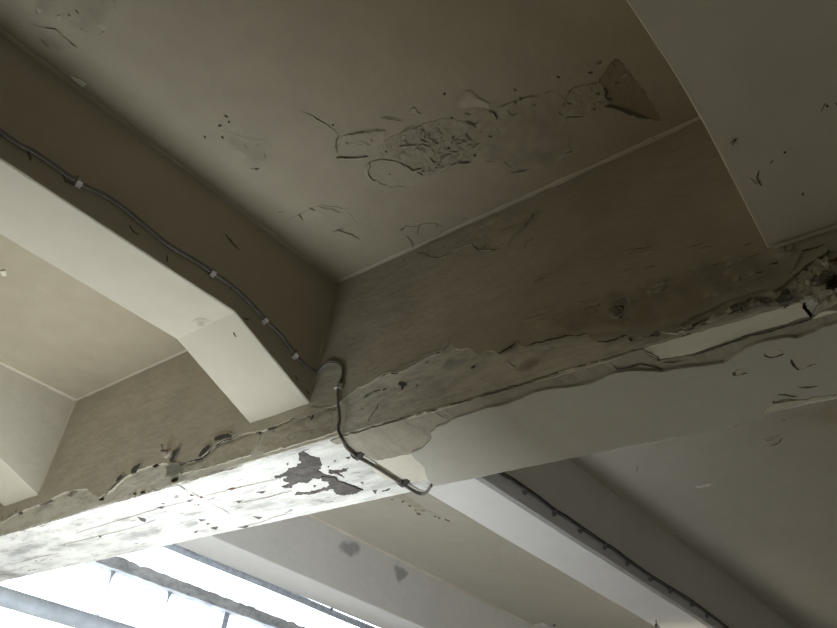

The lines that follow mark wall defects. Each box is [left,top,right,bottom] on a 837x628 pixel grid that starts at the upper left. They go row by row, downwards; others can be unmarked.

peeling [274,240,837,522]